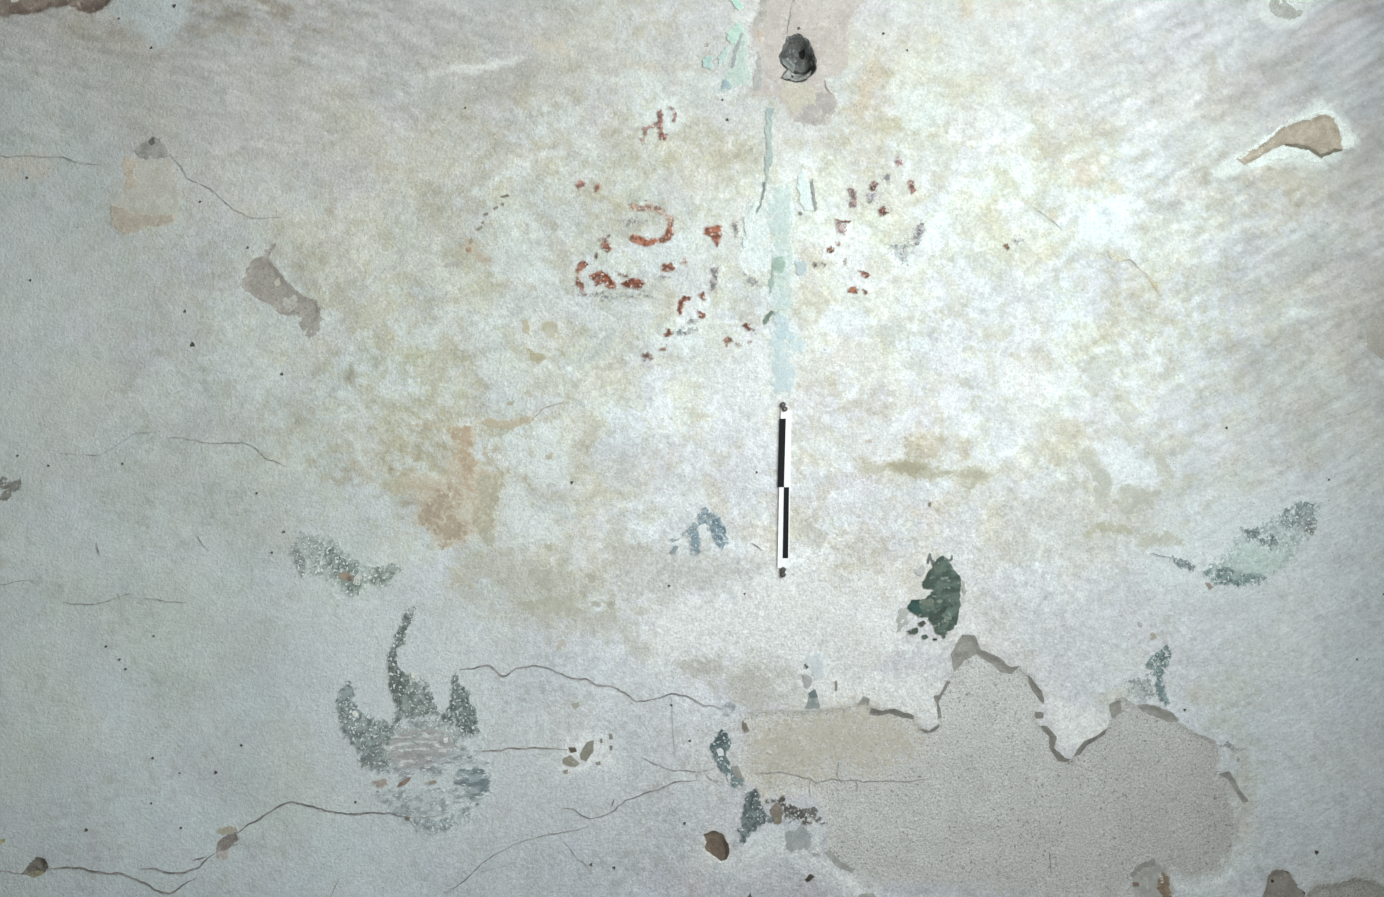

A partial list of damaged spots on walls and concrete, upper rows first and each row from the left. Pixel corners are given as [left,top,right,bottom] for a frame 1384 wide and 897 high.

flaking render [0,0,120,20]
flaking render [1236,110,1356,168]
flaking render [240,243,324,338]
flaking render [0,477,22,500]
peeling [1240,501,1318,551]
peeling [1172,555,1266,587]
crack [445,664,722,893]
flaking render [732,620,1249,897]
crack [0,801,448,894]
flaking render [1263,869,1384,897]